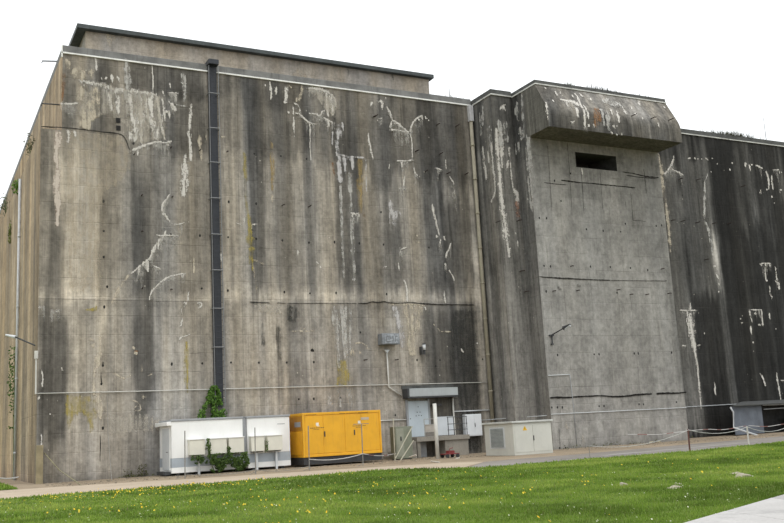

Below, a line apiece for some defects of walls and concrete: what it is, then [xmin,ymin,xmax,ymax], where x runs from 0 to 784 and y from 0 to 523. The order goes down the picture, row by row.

damp [265,81,337,117]
damp [53,58,206,226]
damp [332,122,374,281]
efflorescence [479,95,534,258]
crack [383,204,454,280]
efflorescence [332,306,367,368]
crack [251,299,474,307]
efflorescence [392,280,426,356]
damp [451,311,481,451]